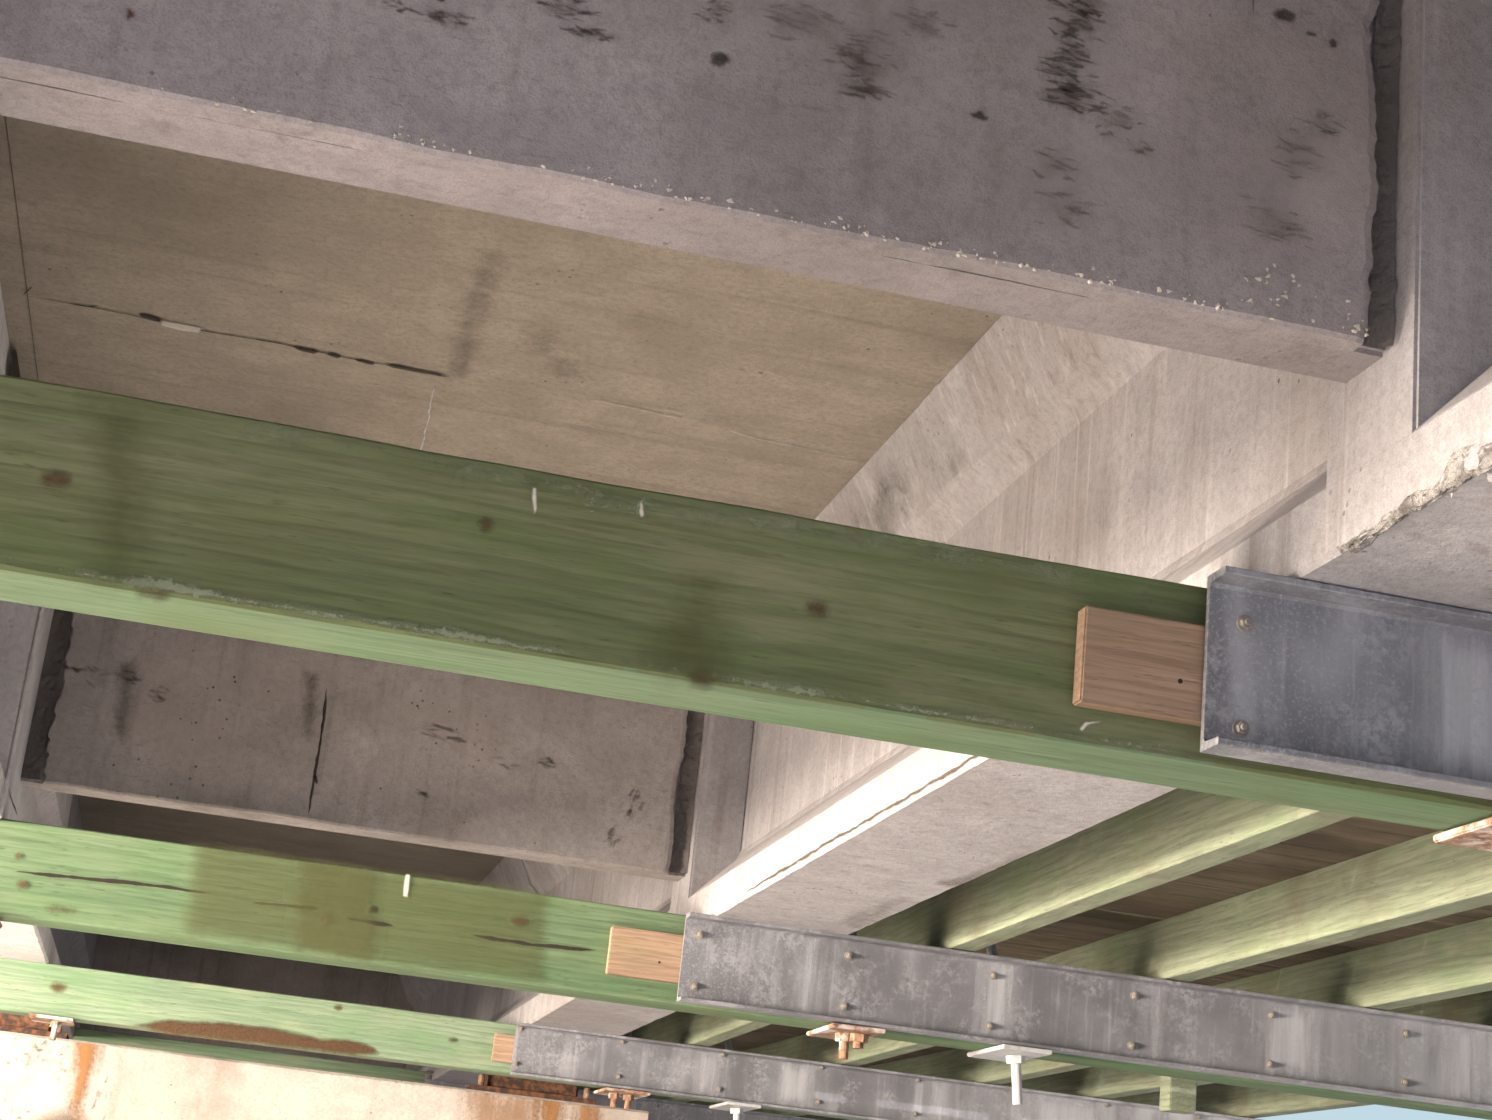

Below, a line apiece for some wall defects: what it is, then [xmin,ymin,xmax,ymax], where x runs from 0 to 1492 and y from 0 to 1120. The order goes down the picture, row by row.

crack [23,287,162,323]
crack [201,330,447,377]
spalling [1339,444,1492,554]
crack [308,690,327,813]
rust [71,1042,103,1104]
rust [542,1100,560,1120]